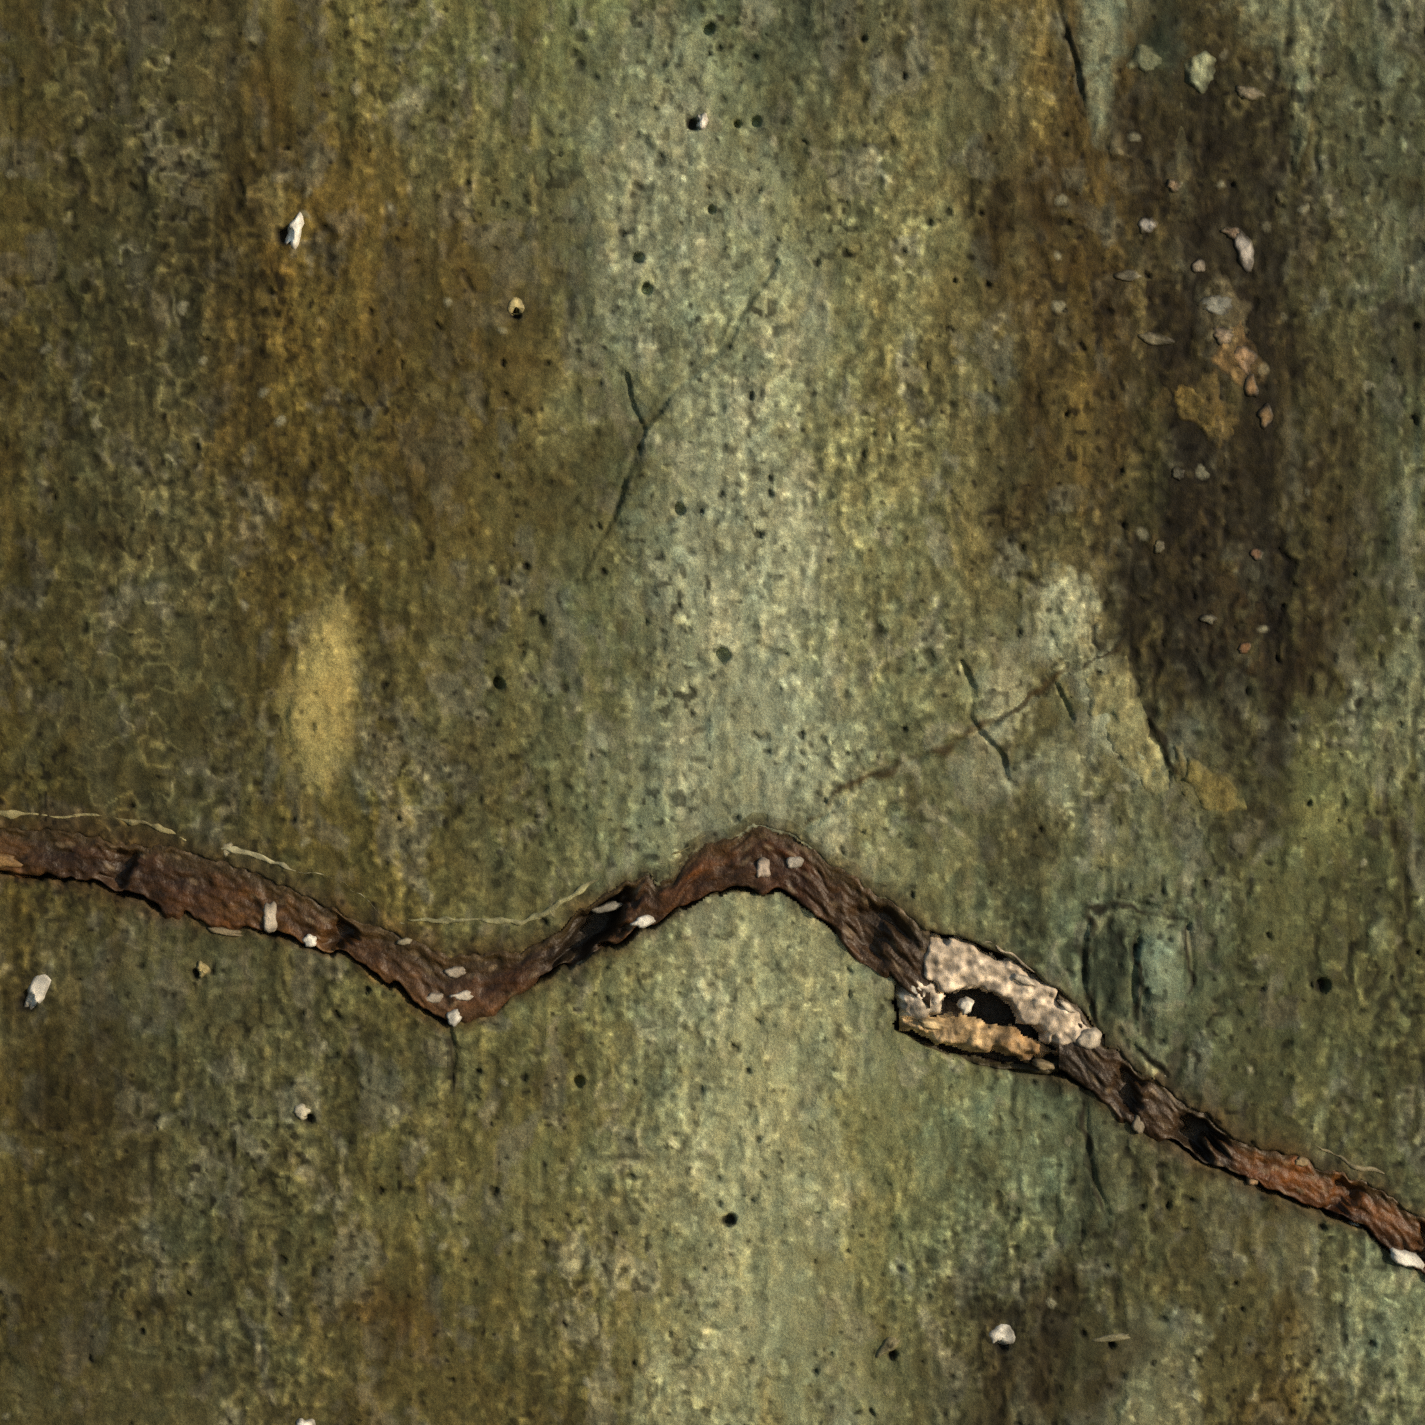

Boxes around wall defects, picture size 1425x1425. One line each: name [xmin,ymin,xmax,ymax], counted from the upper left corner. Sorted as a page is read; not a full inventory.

leakage [1051,0,1396,962]
crack [0,637,1127,1101]
spalling [892,931,1102,1075]
leakage [1079,852,1187,1079]
crack [987,897,1425,1274]